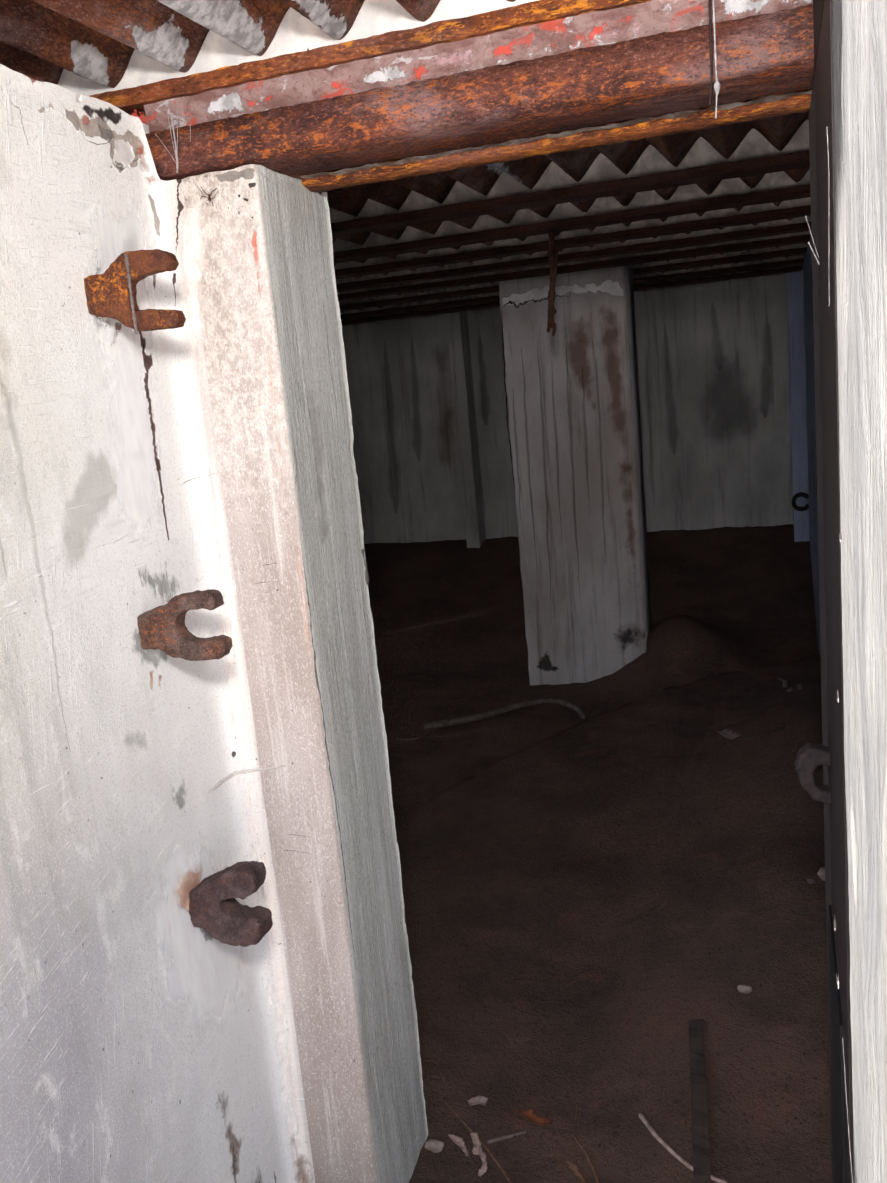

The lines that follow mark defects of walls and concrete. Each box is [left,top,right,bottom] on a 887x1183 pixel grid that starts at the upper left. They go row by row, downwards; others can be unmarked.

peeling [493,15,641,63]
peeling [39,94,160,236]
crack [139,331,169,540]
rust [176,869,202,911]